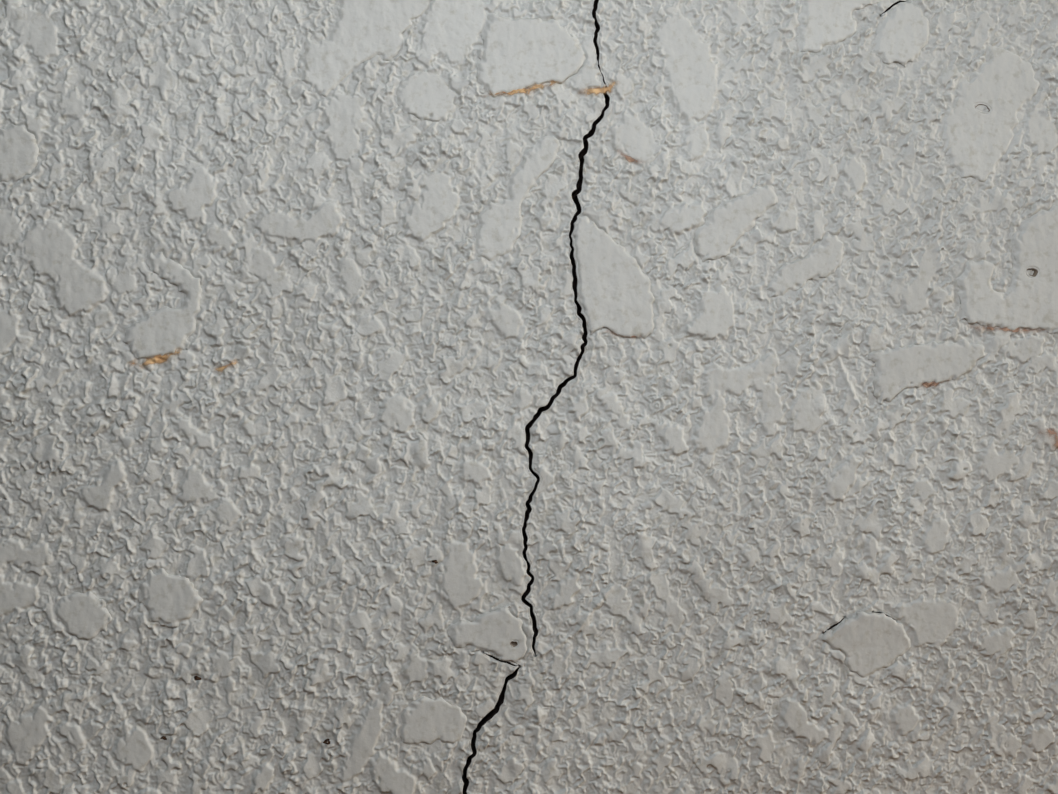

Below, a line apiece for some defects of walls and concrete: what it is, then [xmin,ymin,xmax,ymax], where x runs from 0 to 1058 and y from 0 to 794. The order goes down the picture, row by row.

crack [460,0,611,794]